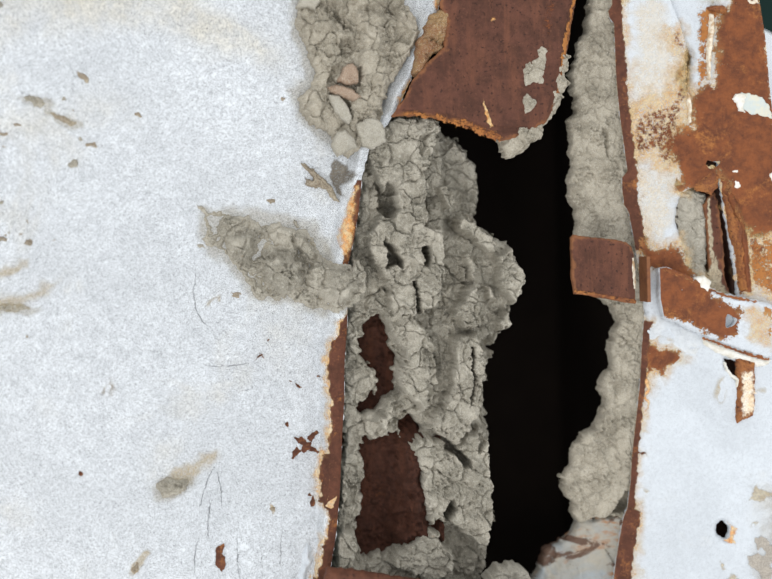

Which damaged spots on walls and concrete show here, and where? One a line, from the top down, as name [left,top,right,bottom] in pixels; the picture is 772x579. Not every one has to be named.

corrosion [398,0,501,142]
corrosion [556,0,576,93]
peeling [732,92,772,119]
corrosion [608,0,772,360]
corrosion [574,290,636,303]
corrosion [310,314,348,579]
corrosion [614,320,681,579]